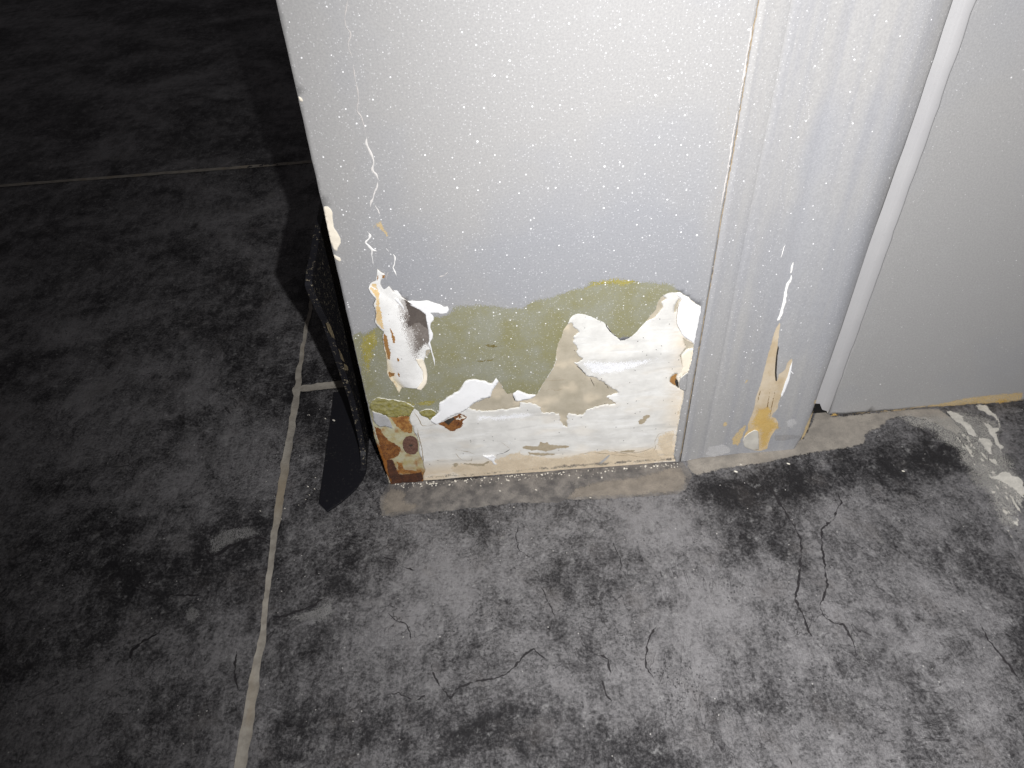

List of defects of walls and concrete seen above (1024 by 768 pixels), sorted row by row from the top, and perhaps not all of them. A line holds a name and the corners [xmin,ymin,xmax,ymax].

peeling [324,206,341,261]
peeling [372,411,392,428]
rust [374,426,423,484]
rust [390,416,413,433]
peeling [369,269,449,393]
leakage [353,278,680,420]
peeling [410,292,701,480]
leakage [732,407,779,447]
crack [744,246,858,659]
leakage [858,392,1024,466]